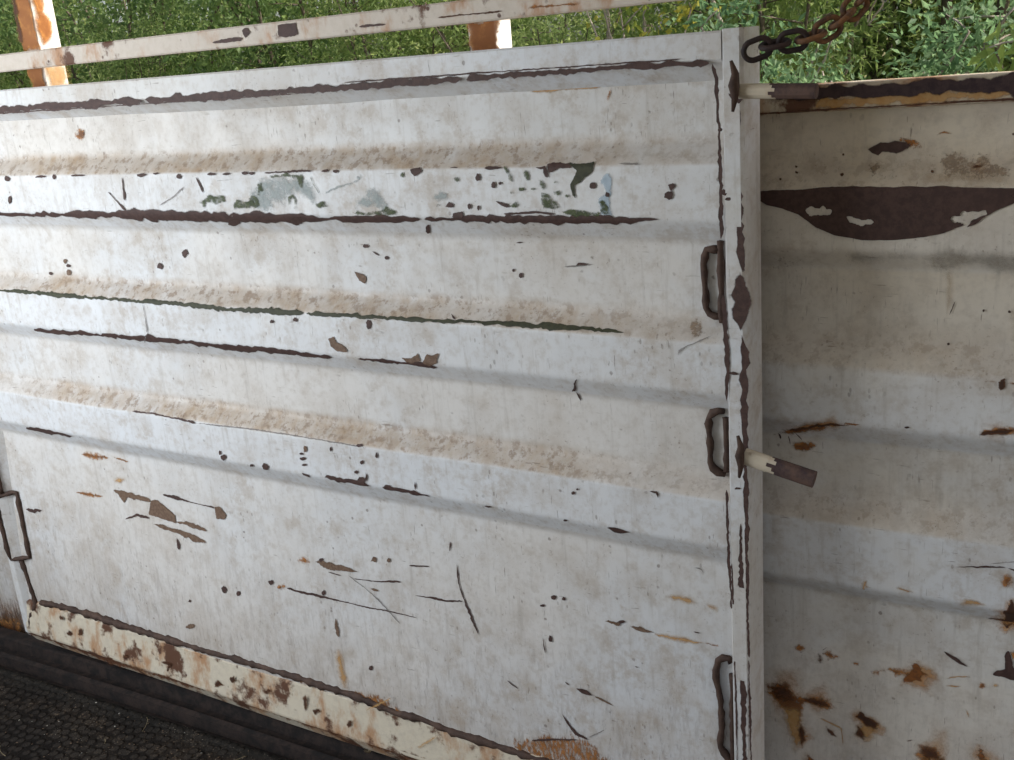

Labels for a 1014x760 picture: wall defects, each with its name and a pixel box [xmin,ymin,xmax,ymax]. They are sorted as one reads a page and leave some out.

rust [438,10,501,51]
rust [760,91,1014,115]
peeling [795,71,1014,101]
spalling [0,161,658,234]
peeling [760,186,1014,240]
peeling [712,64,751,453]
peeling [114,479,226,549]
peeling [725,465,752,760]
rust [0,601,203,690]
rust [873,663,935,687]
rust [767,683,843,745]
rust [854,712,881,740]